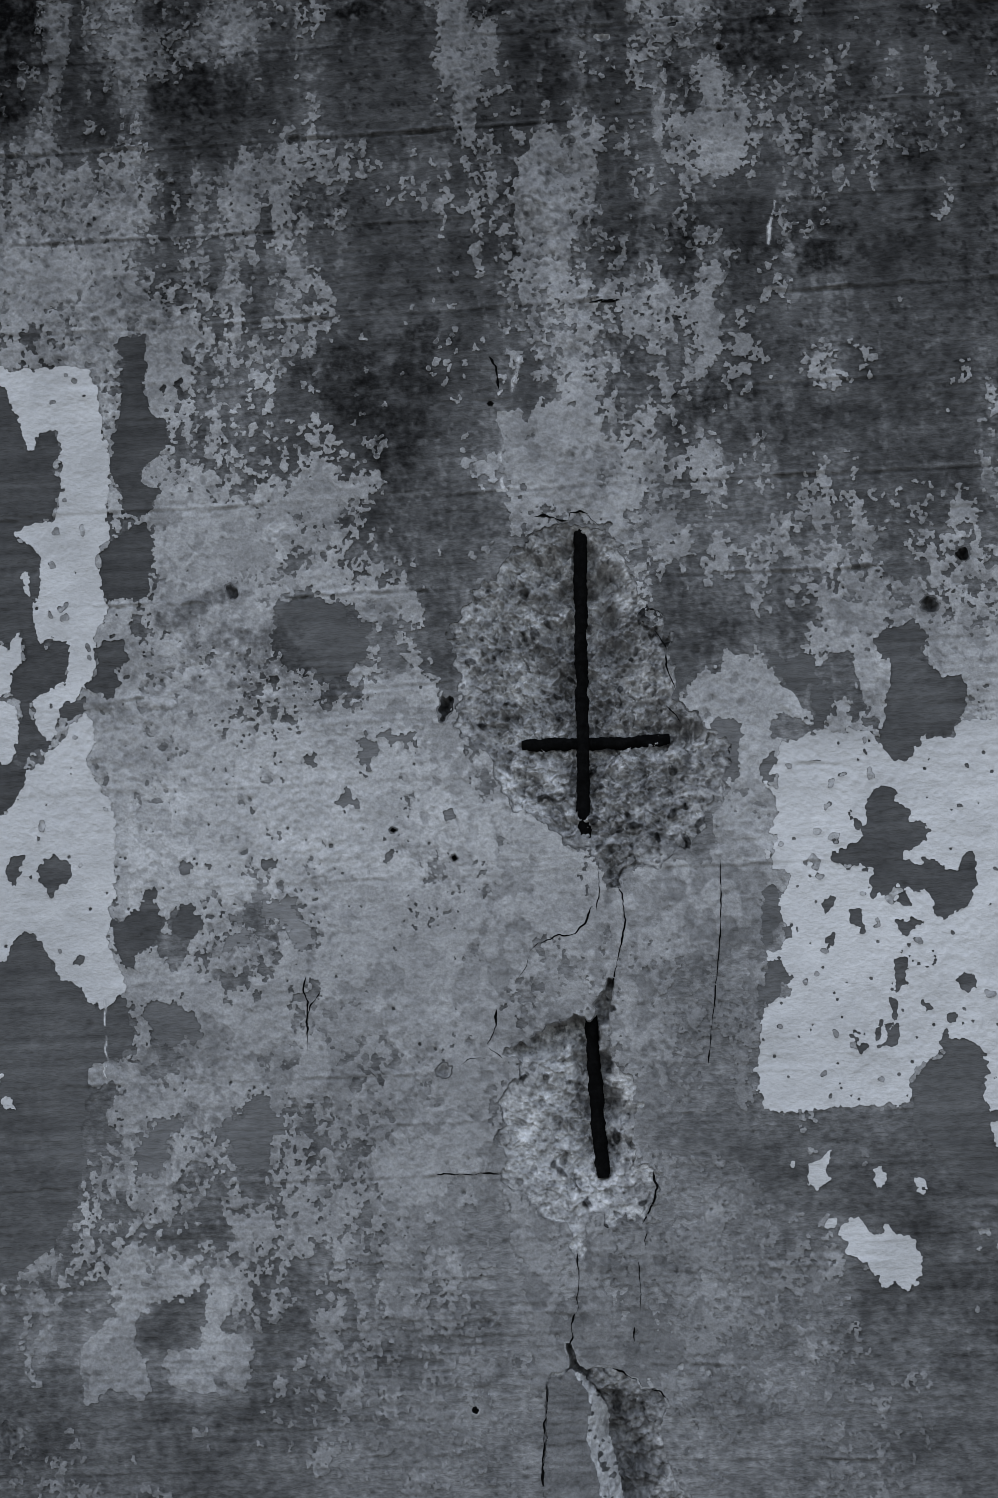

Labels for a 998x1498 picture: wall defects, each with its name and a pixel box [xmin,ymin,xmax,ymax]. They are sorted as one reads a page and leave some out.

peeling [78,0,284,97]
peeling [281,0,331,40]
peeling [624,0,723,95]
peeling [916,44,962,153]
peeling [832,105,909,192]
peeling [757,189,814,304]
peeling [426,297,486,404]
peeling [798,337,878,391]
peeling [950,357,998,438]
peeling [790,1147,832,1191]
peeling [861,1149,887,1188]
peeling [914,1177,928,1195]